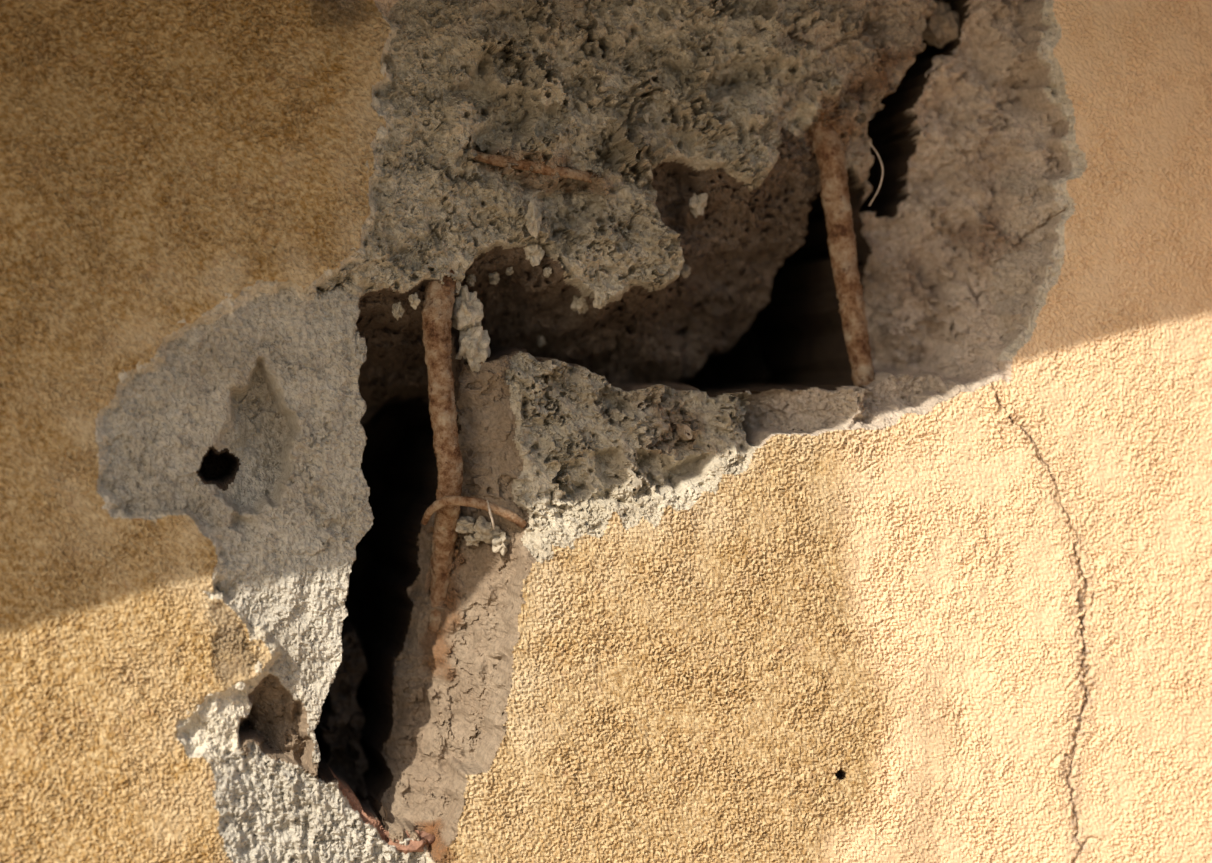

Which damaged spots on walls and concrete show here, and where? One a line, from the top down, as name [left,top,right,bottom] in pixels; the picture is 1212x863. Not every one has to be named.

spalling [298,0,1087,563]
flaking render [96,280,435,863]
rust [426,548,461,670]
crack [990,381,1102,863]